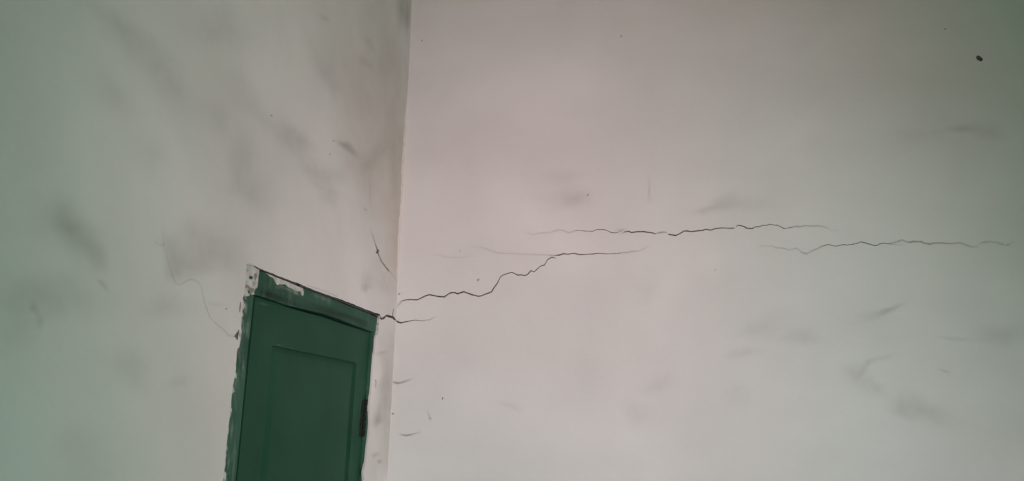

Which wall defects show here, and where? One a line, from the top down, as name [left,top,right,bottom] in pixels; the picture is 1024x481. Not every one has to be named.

crack [254,224,791,324]
crack [823,240,889,248]